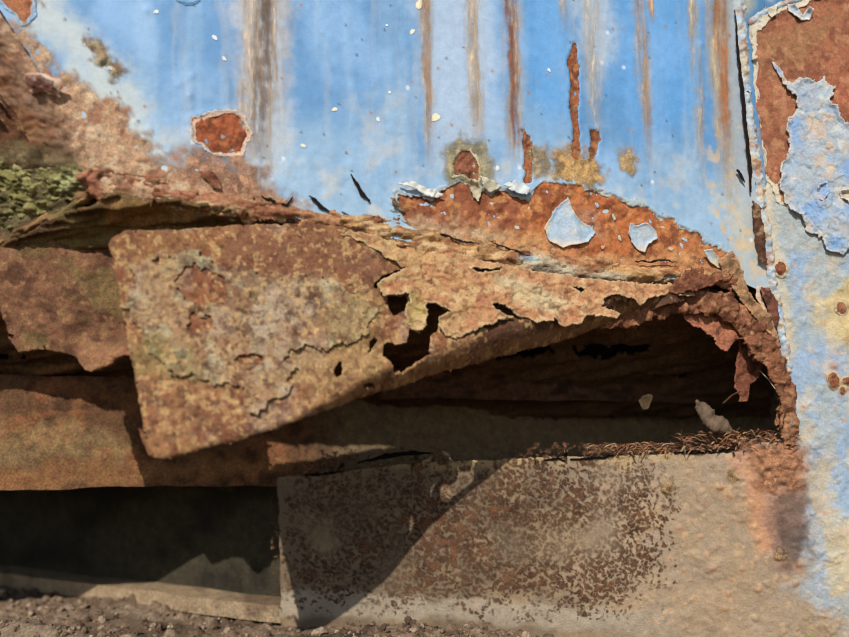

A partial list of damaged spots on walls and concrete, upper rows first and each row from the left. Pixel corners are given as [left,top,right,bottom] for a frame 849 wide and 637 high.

corrosion [5,0,295,209]
corrosion [468,0,481,120]
corrosion [506,3,520,145]
crack [734,10,753,192]
corrosion [751,0,849,255]
corrosion [341,137,734,339]
corrosion [752,201,768,265]
corrosion [741,438,809,568]